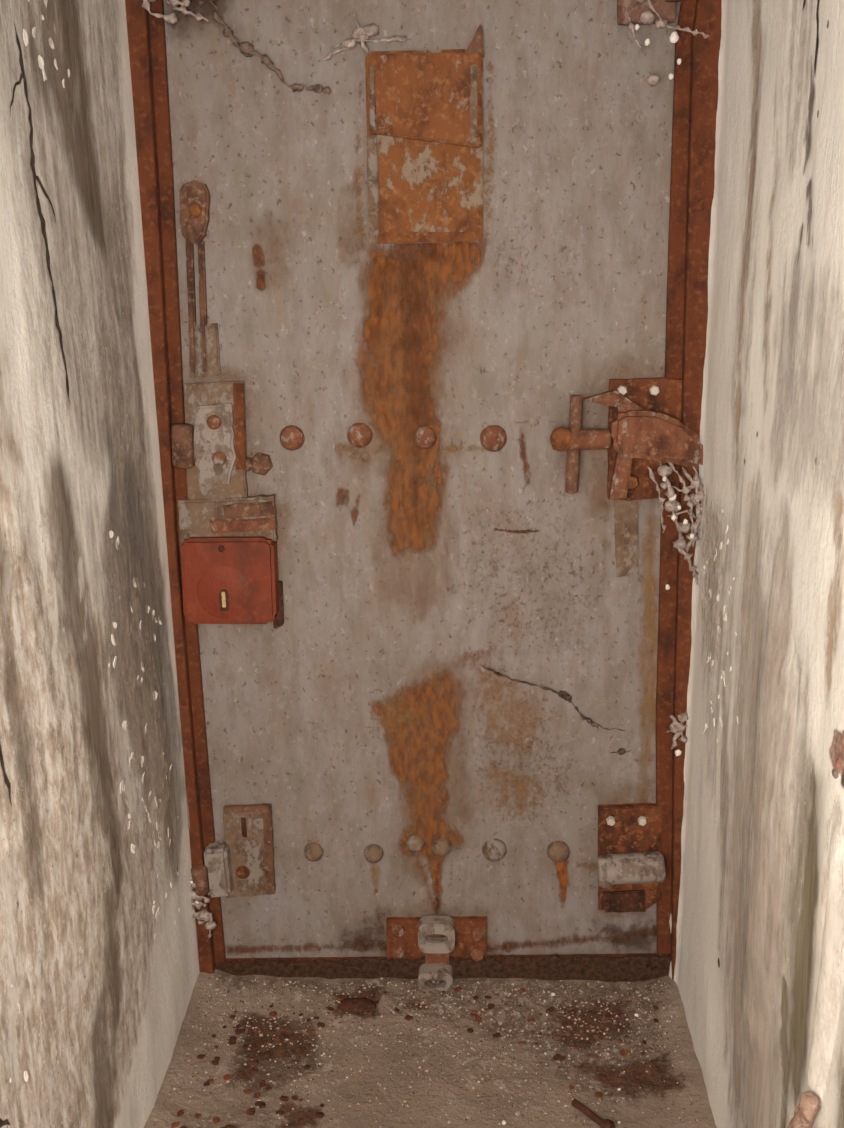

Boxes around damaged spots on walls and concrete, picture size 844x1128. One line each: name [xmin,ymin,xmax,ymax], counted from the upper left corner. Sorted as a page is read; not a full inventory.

crack [10,23,70,403]
water stain [739,0,760,346]
water stain [798,67,814,259]
rust [356,239,486,556]
rust [519,434,529,471]
crack [0,744,12,806]
water stain [51,464,143,1128]
water stain [107,430,190,875]
rust [373,671,463,912]
rust [555,859,595,902]
water stain [723,501,844,1128]
spalling [829,730,844,788]